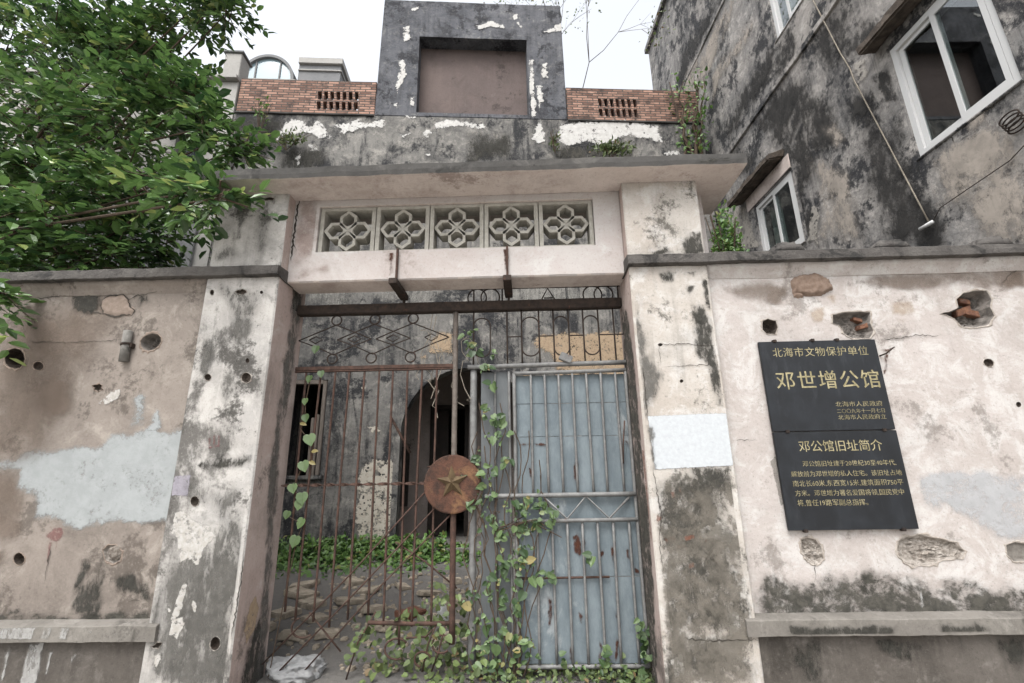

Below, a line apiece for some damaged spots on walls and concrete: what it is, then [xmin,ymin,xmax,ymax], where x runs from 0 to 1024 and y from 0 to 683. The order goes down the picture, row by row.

peeling [394,60,407,106]
mould [678,0,724,86]
peeling [423,120,487,138]
mould [722,27,844,241]
mould [847,70,946,246]
spalling [830,310,876,340]
spalling [941,288,997,329]
damp [198,439,249,468]
damp [621,309,1024,683]
damp [0,492,241,683]
peeling [152,584,197,667]
spalling [895,532,968,569]